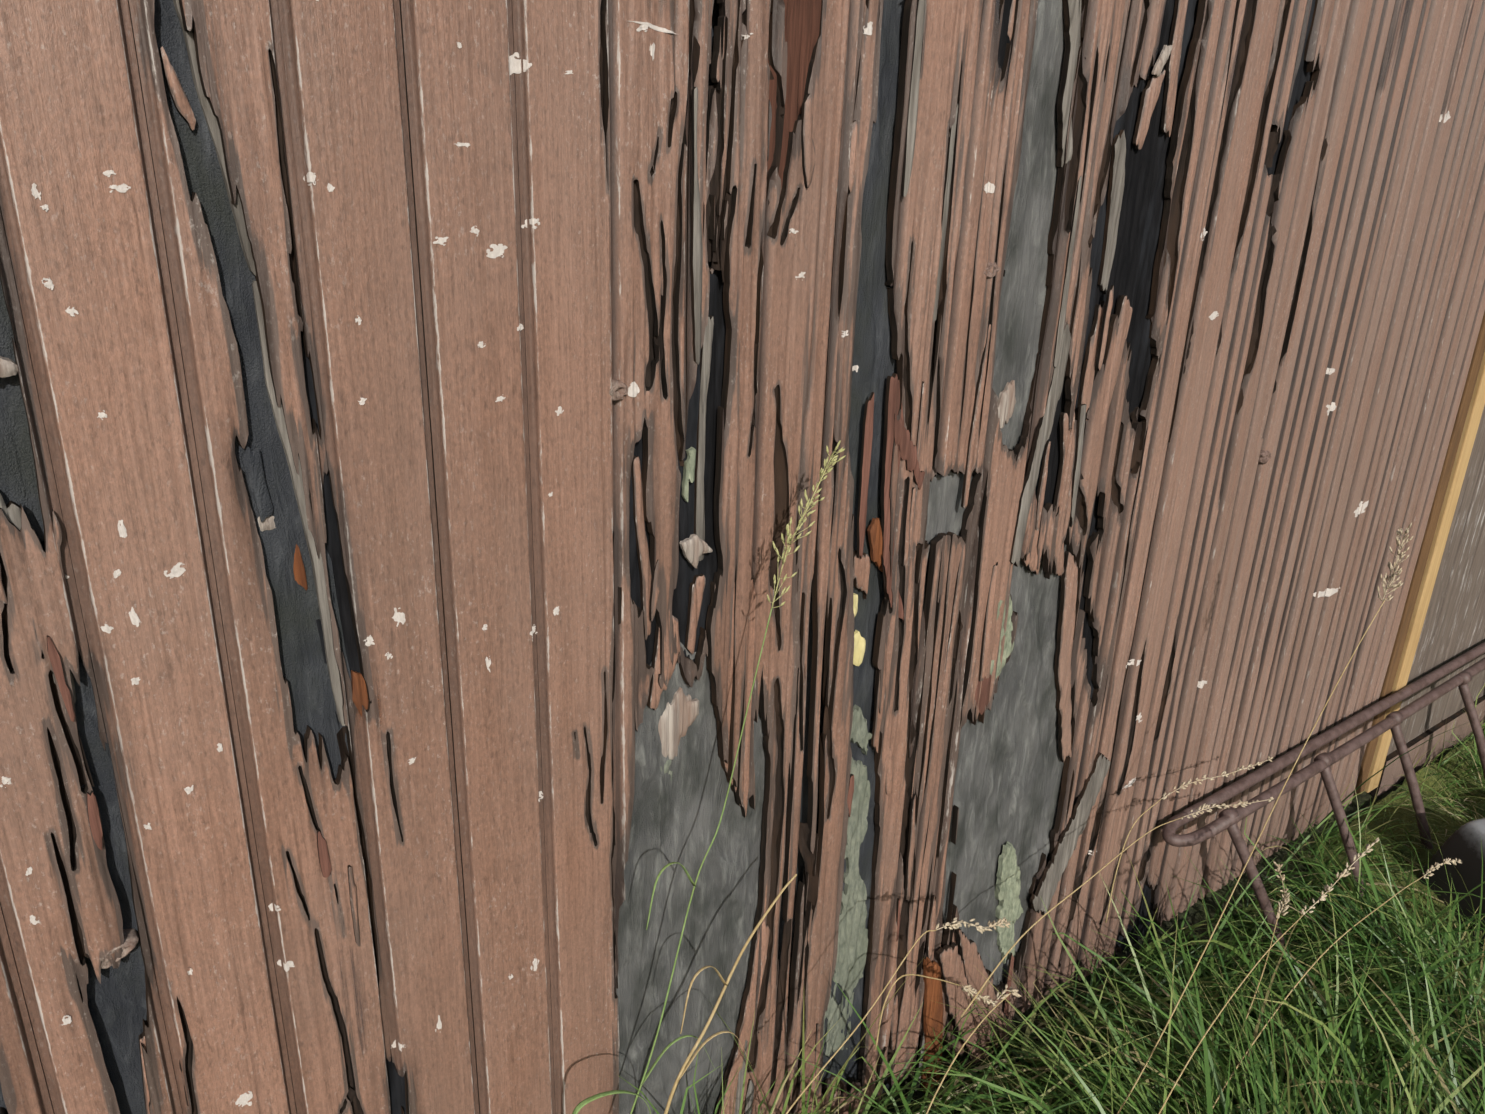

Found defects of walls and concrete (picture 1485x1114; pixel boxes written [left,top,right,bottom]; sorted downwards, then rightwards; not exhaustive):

peeling [630,21,675,61]
peeling [103,170,131,193]
peeling [303,172,335,192]
peeling [628,382,640,397]
peeling [1354,500,1369,517]
peeling [118,520,127,538]
peeling [164,562,186,579]
peeling [1313,587,1340,598]
peeling [129,607,142,631]
peeling [392,608,406,627]
peeling [364,635,393,660]
peeling [235,1091,253,1107]